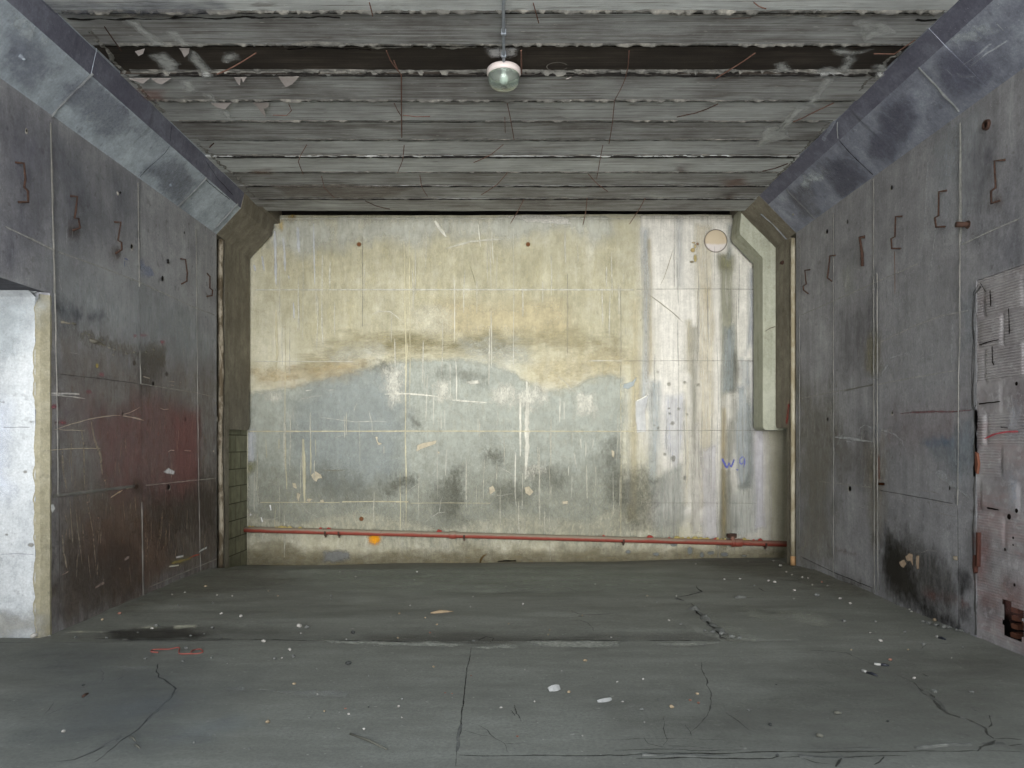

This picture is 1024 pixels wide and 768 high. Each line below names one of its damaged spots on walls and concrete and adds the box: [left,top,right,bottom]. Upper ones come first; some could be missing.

damp [248,216,770,549]
crack [57,638,218,762]
crack [452,587,1021,767]
damp [883,531,968,629]
spalling [1010,607,1024,639]